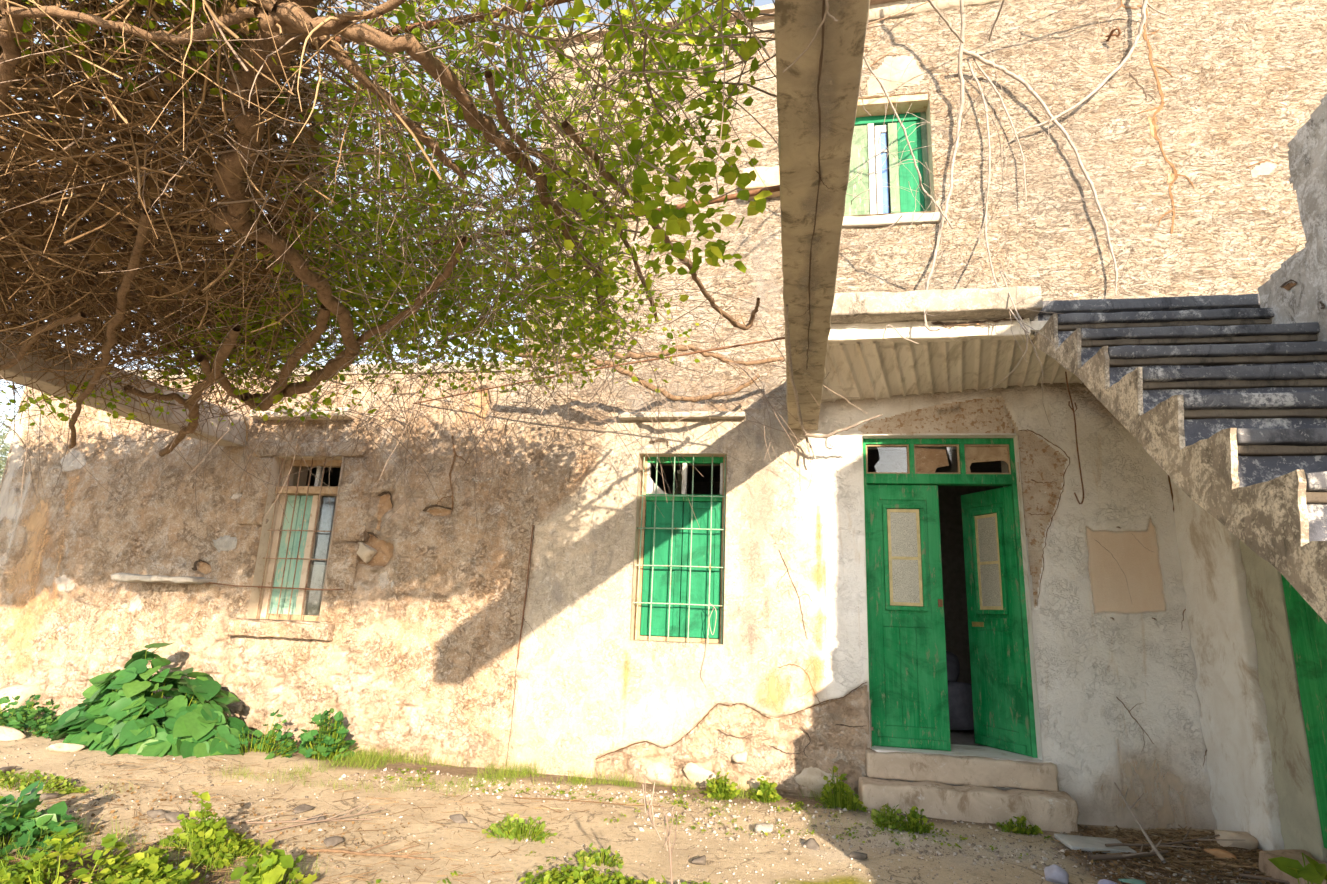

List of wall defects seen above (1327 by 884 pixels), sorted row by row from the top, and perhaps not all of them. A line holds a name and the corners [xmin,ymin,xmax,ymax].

crack [795,0,831,363]
crack [1110,0,1195,234]
flaking render [355,491,394,584]
flaking render [858,396,1070,608]
flaking render [595,682,873,800]